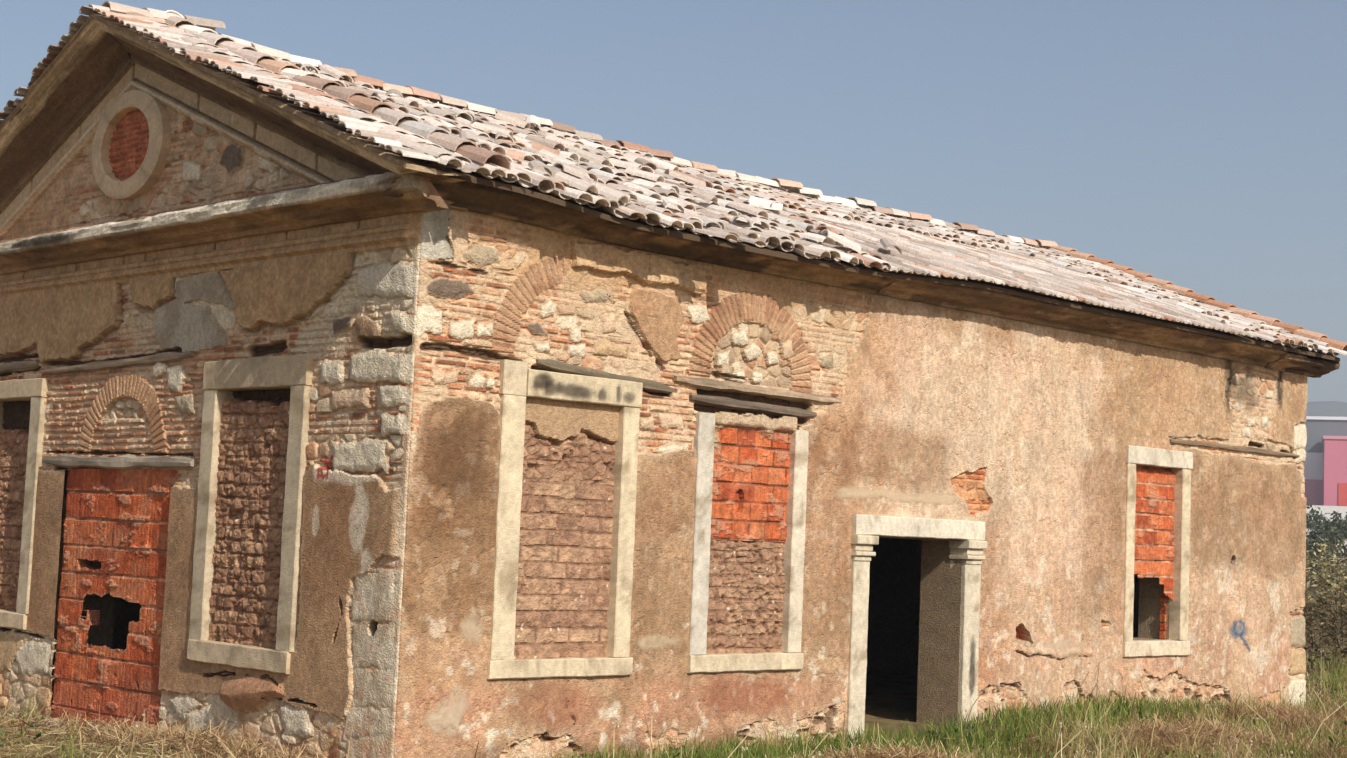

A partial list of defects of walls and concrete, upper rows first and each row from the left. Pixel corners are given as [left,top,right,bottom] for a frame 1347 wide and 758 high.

flaking render [0,209,870,492]
flaking render [1169,368,1307,498]
flaking render [950,468,992,515]
spalling [81,593,100,626]
flaking render [0,627,57,719]
flaking render [977,683,1028,723]
flaking render [1135,673,1230,709]
flaking render [500,734,583,758]
flaking render [731,702,846,753]